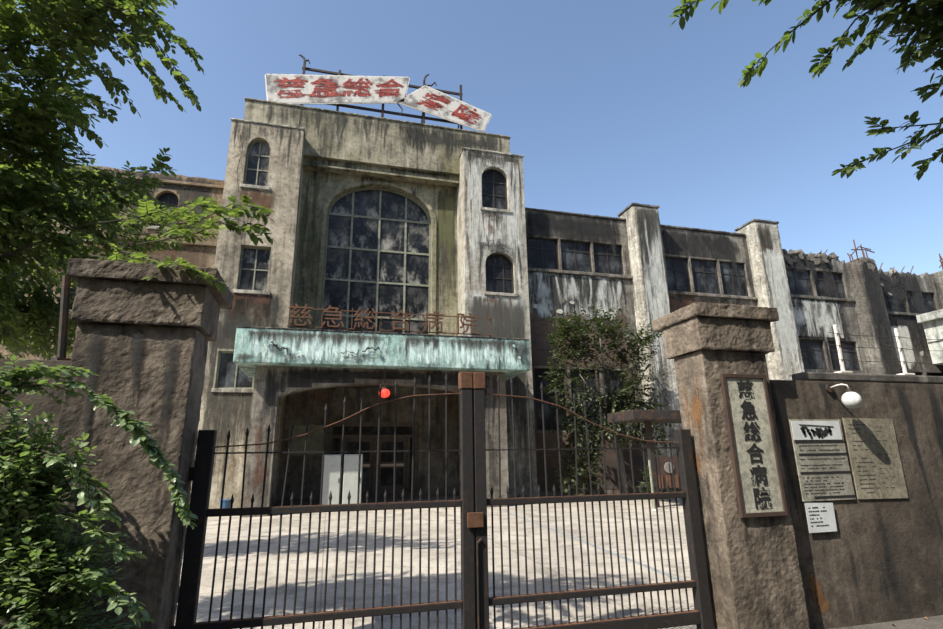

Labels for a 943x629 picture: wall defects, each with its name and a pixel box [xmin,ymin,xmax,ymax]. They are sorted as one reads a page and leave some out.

leakage [234,105,323,158]
leakage [335,115,522,203]
spalling [782,240,914,296]
corrosion [231,293,272,324]
leakage [758,225,845,370]
crack [270,341,299,358]
crack [336,347,380,359]
leakage [202,213,626,490]